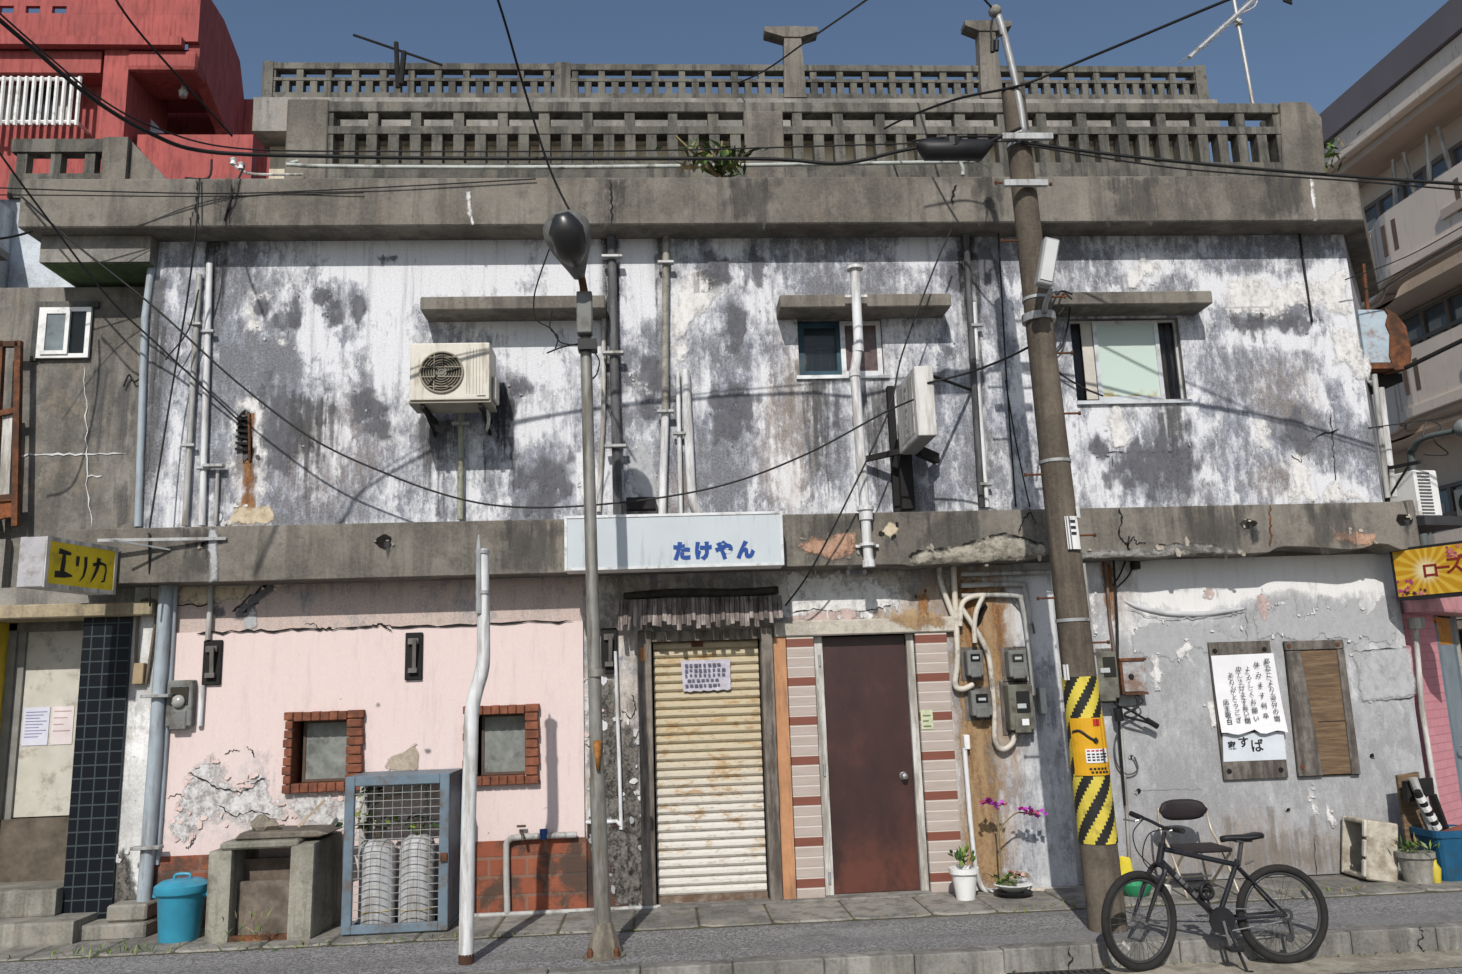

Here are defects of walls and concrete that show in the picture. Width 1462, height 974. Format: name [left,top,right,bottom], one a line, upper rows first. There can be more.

corrosion [240,460,256,524]
water stain [290,396,339,500]
water stain [483,383,516,492]
water stain [802,380,839,467]
peeling [782,533,902,621]
spalling [878,521,1046,567]
crack [1118,508,1146,551]
water stain [1158,404,1191,451]
crack [197,620,568,635]
corrosion [891,578,1007,886]
peeling [167,746,360,849]
peeling [583,675,642,906]